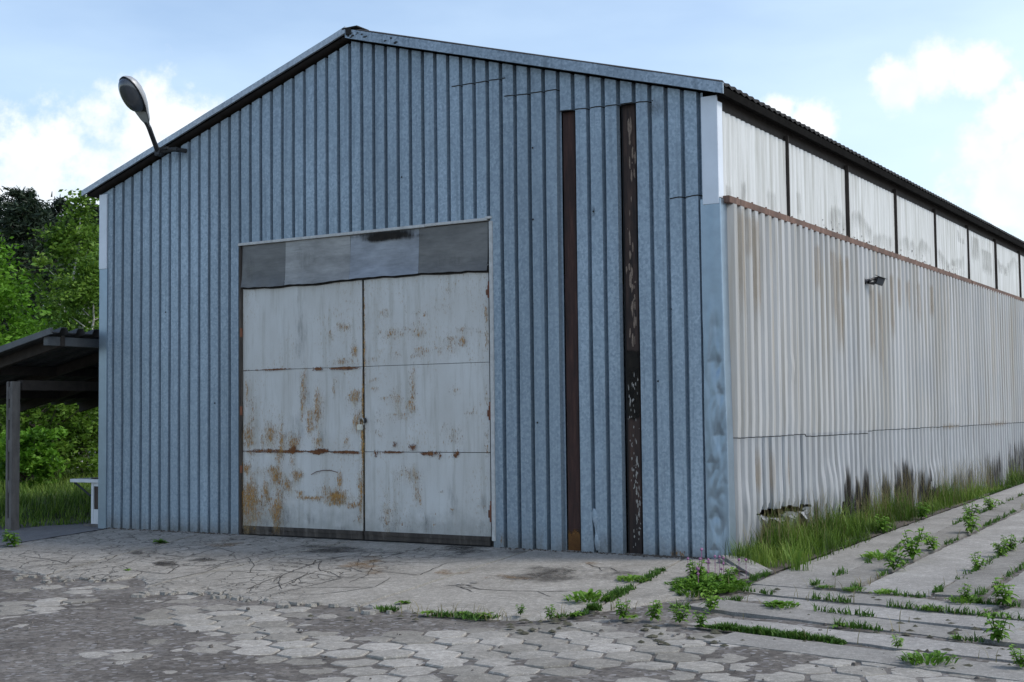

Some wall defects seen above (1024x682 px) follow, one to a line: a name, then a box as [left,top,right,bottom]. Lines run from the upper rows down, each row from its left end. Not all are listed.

corrosion [242,304,488,531]
peeling [628,374,641,548]
damp [987,439,1024,490]
corrosion [568,530,581,551]
crack [20,545,513,595]